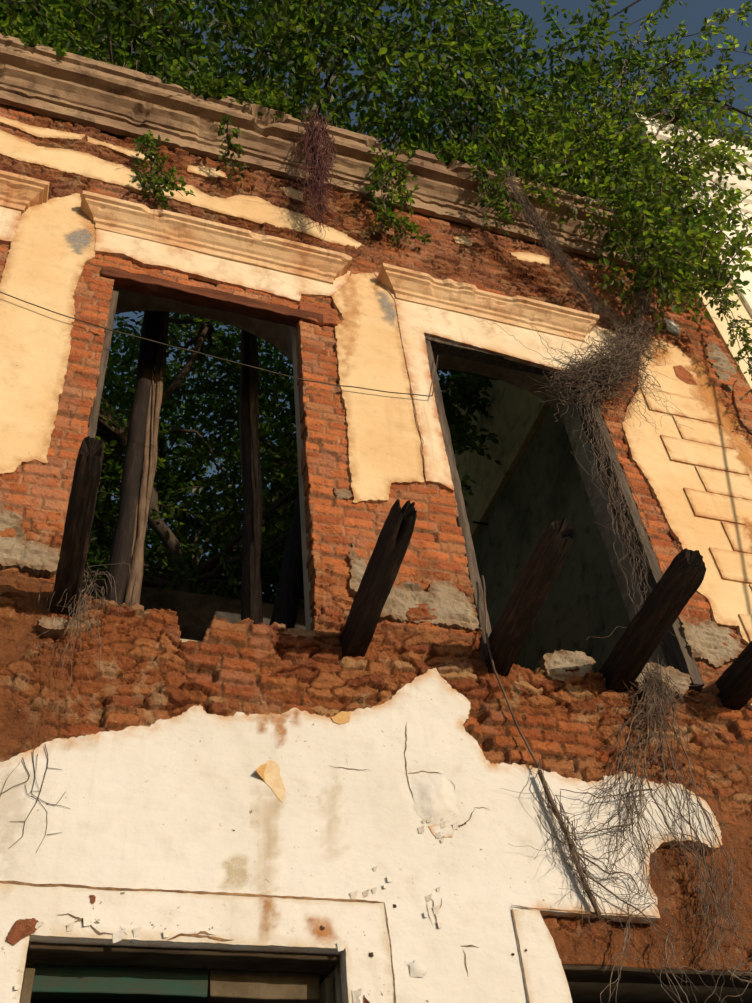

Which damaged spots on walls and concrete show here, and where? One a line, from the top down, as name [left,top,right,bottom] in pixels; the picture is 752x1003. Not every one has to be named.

spalling [0,104,752,575]
spalling [0,254,752,972]
crack [404,722,455,800]
crack [0,881,396,1003]
rust [309,919,332,938]